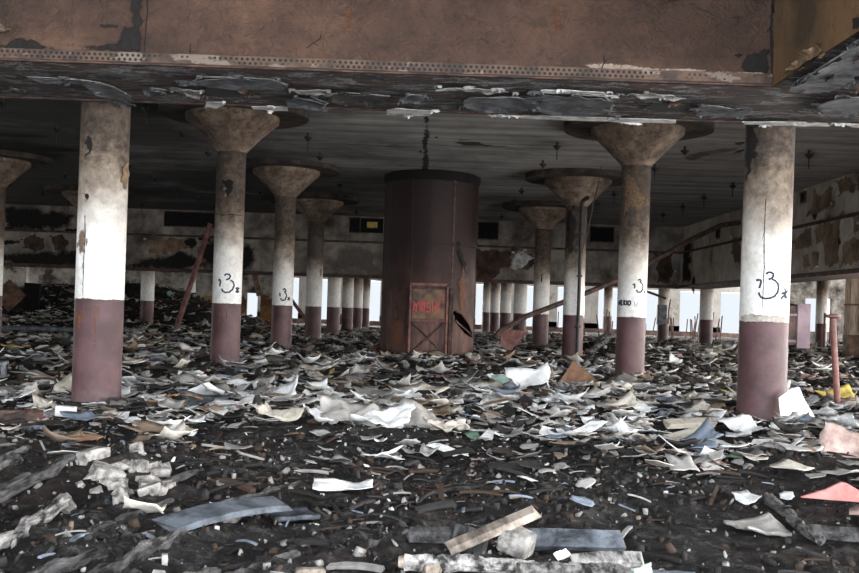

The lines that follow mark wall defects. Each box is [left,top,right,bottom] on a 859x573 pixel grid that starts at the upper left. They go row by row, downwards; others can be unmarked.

damp [89,0,143,52]
peeling [26,76,136,108]
peeling [142,14,859,128]
peeling [19,233,69,255]
peeling [476,248,535,283]
peeling [792,171,859,270]